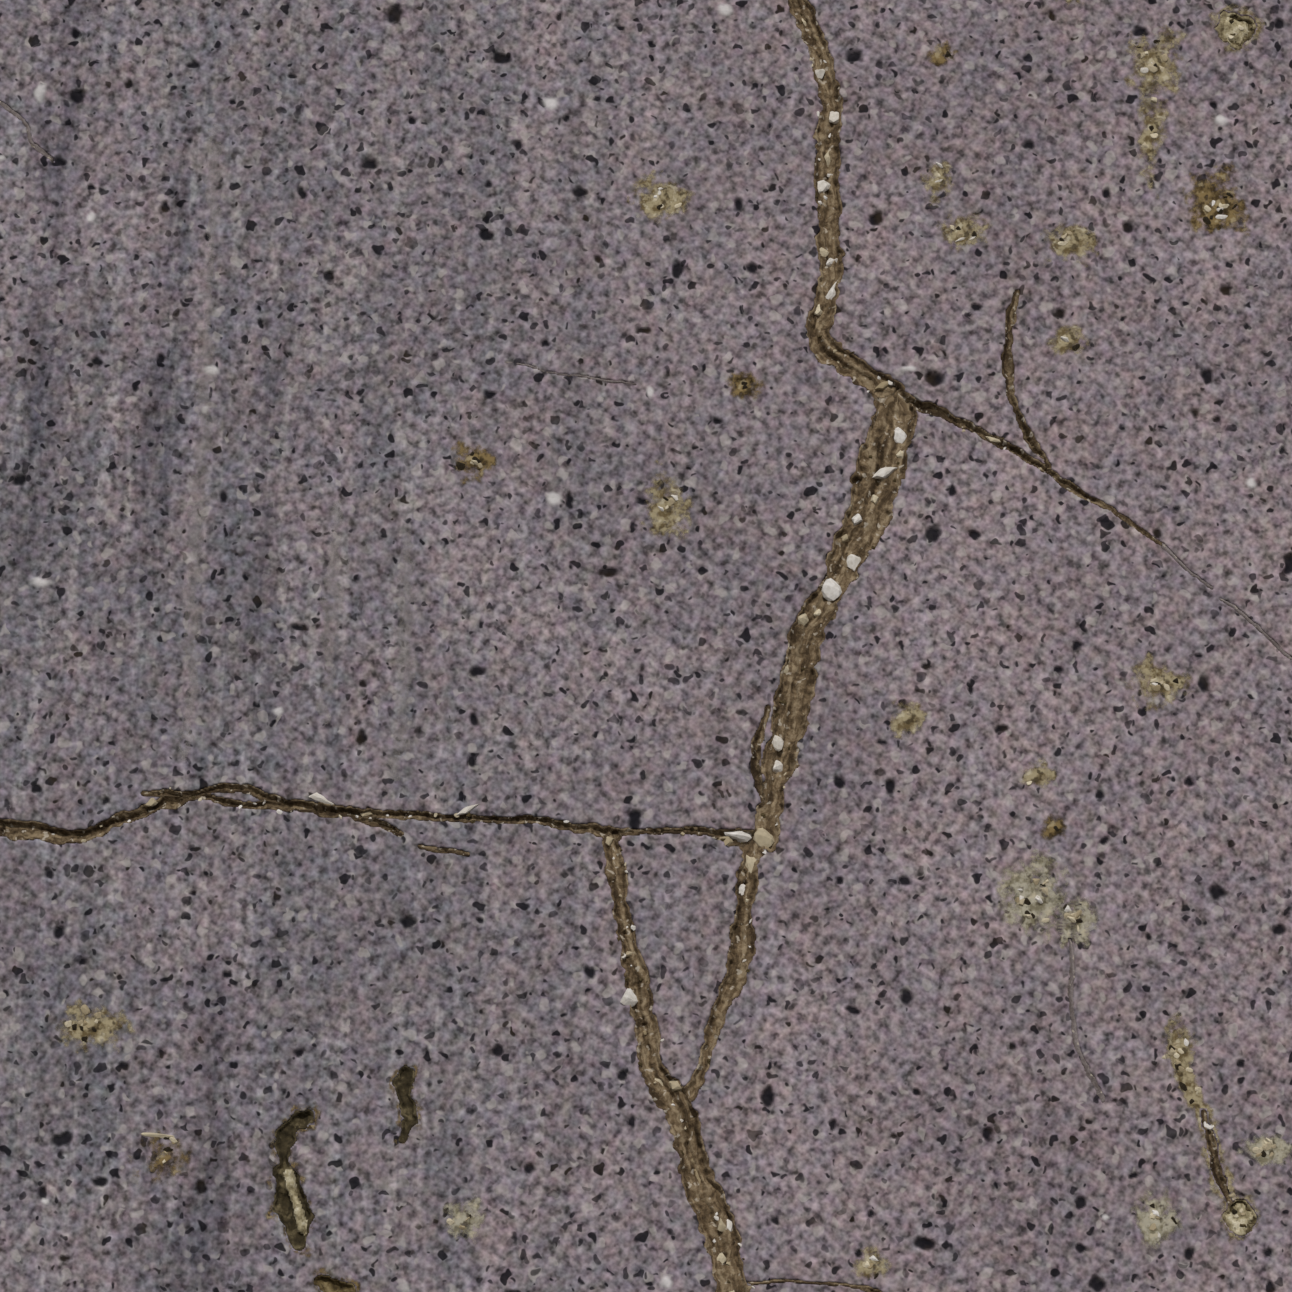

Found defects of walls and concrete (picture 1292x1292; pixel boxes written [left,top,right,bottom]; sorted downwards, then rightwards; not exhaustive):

spalling [1209,6,1264,51]
crack [0,101,54,163]
crack [505,362,636,385]
crack [602,0,1213,1292]
crack [1219,598,1292,660]
crack [0,783,755,847]
crack [417,844,470,857]
spalling [389,1065,421,1144]
spalling [267,1105,319,1257]
crack [1201,1109,1234,1206]
spalling [314,1268,360,1292]